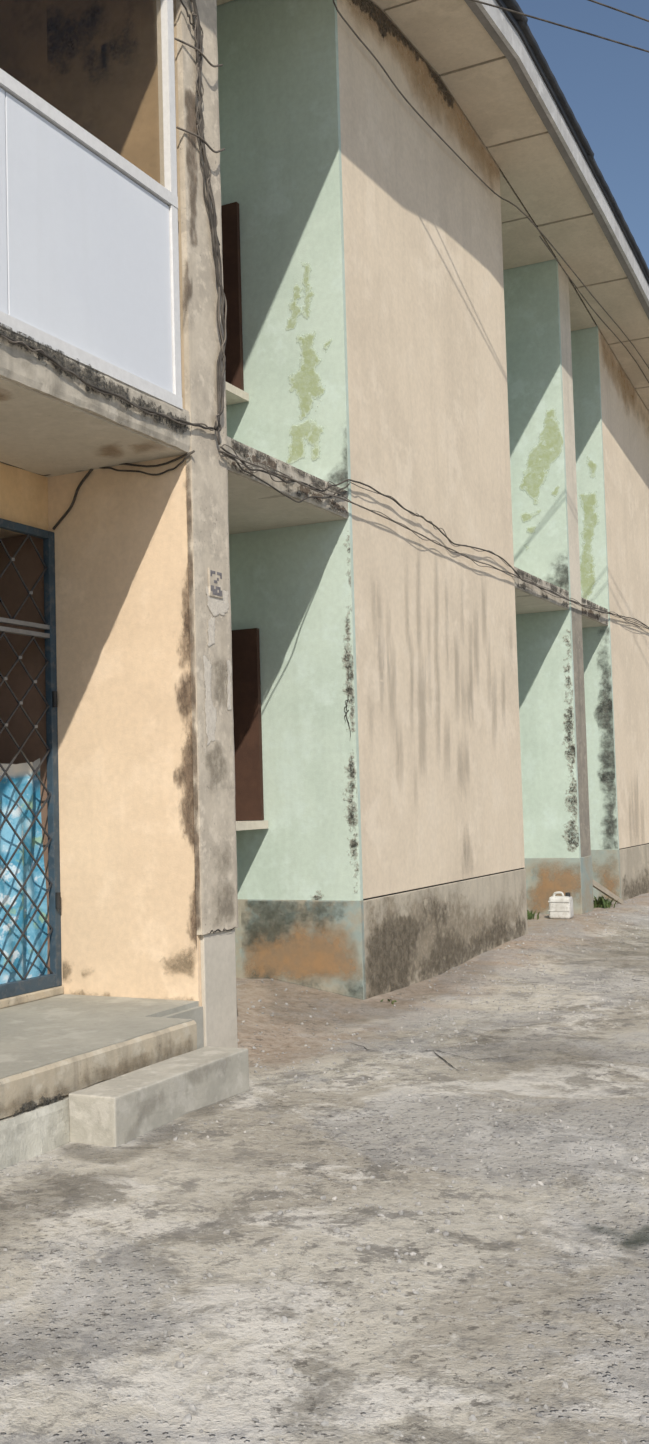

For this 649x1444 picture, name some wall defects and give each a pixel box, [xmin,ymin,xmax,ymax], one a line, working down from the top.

water stain [352,0,454,108]
water stain [0,323,192,433]
peeling [231,263,349,514]
peeling [519,409,563,550]
peeling [526,456,601,621]
peeling [341,605,355,732]
water stain [167,553,200,972]
water stain [246,901,327,944]
peeling [343,755,359,892]
water stain [351,911,525,996]
water stain [596,661,617,849]
water stain [624,871,649,899]